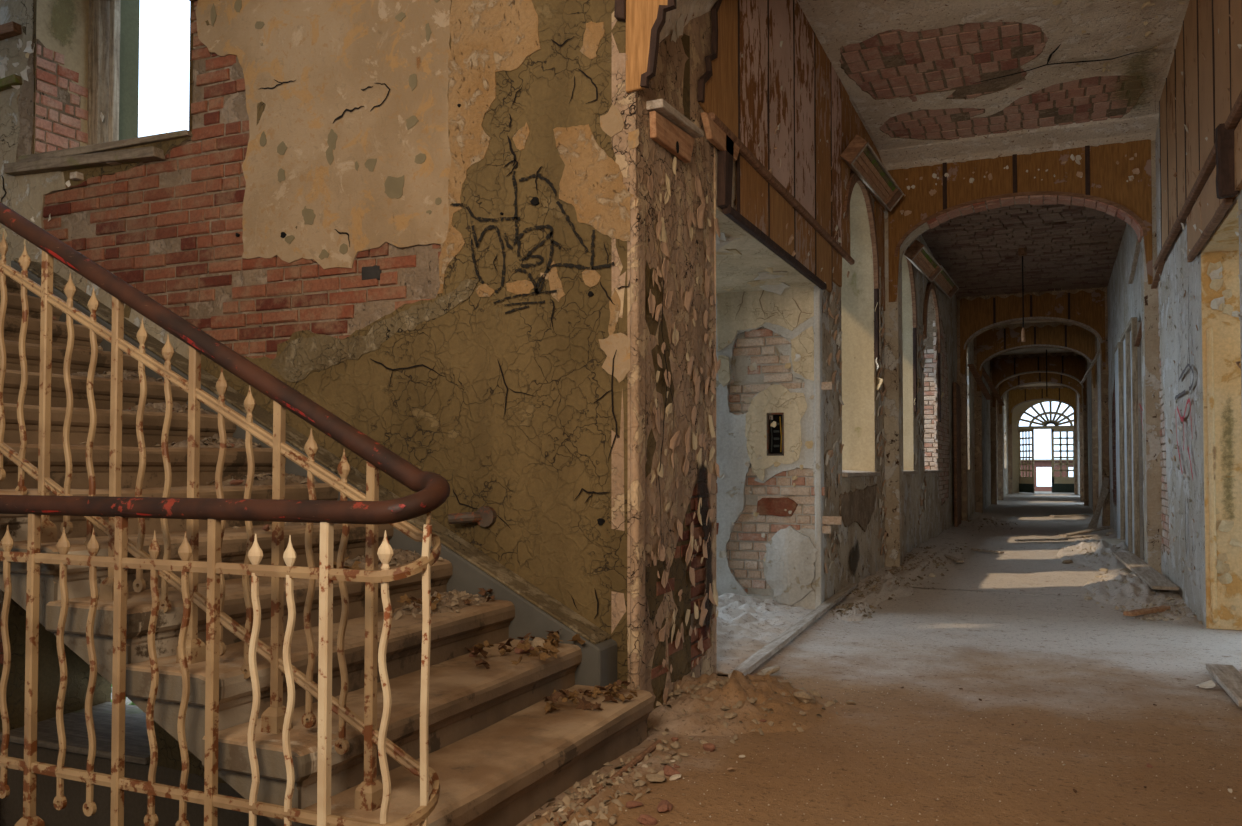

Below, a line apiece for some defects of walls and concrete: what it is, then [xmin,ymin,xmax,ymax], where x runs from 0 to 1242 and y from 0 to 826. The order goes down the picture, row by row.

crack [333,83,390,123]
peeling [580,21,605,59]
flaking render [827,22,1145,140]
peeling [0,0,565,382]
peeling [553,104,640,241]
crack [497,359,533,415]
peeling [582,268,601,297]
crack [574,350,617,504]
peeling [598,288,630,383]
peeling [648,157,888,703]